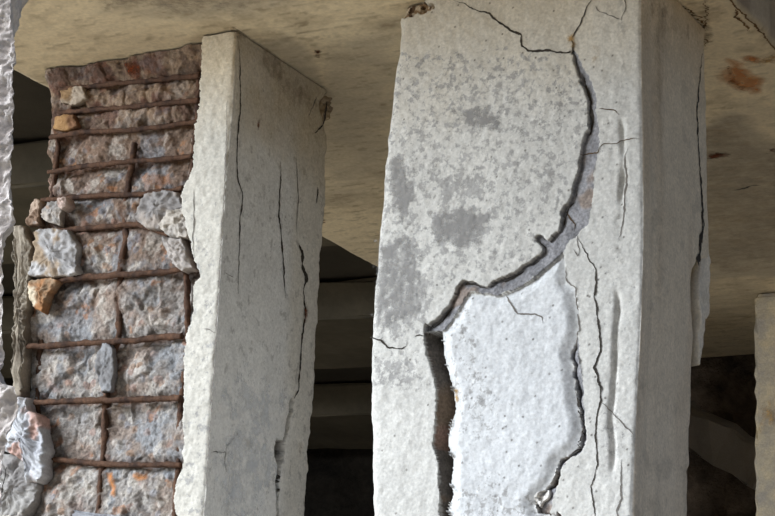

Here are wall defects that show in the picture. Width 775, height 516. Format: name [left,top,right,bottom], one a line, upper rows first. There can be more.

spalling [0,44,202,516]
crack [274,163,319,514]
crack [370,0,638,516]
crack [683,2,709,265]
rust [728,64,760,91]
crack [730,0,775,50]